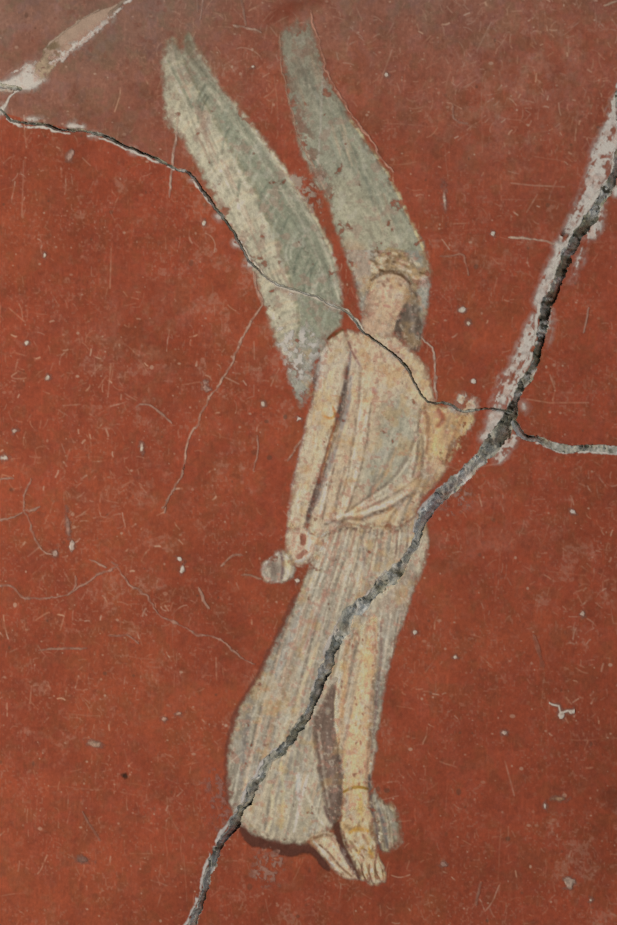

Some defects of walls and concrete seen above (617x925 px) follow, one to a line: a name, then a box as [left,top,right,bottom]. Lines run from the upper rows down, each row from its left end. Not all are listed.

crack [0,0,506,412]
crack [0,482,53,555]
crack [162,470,183,513]
crack [184,91,617,925]
crack [0,568,253,664]